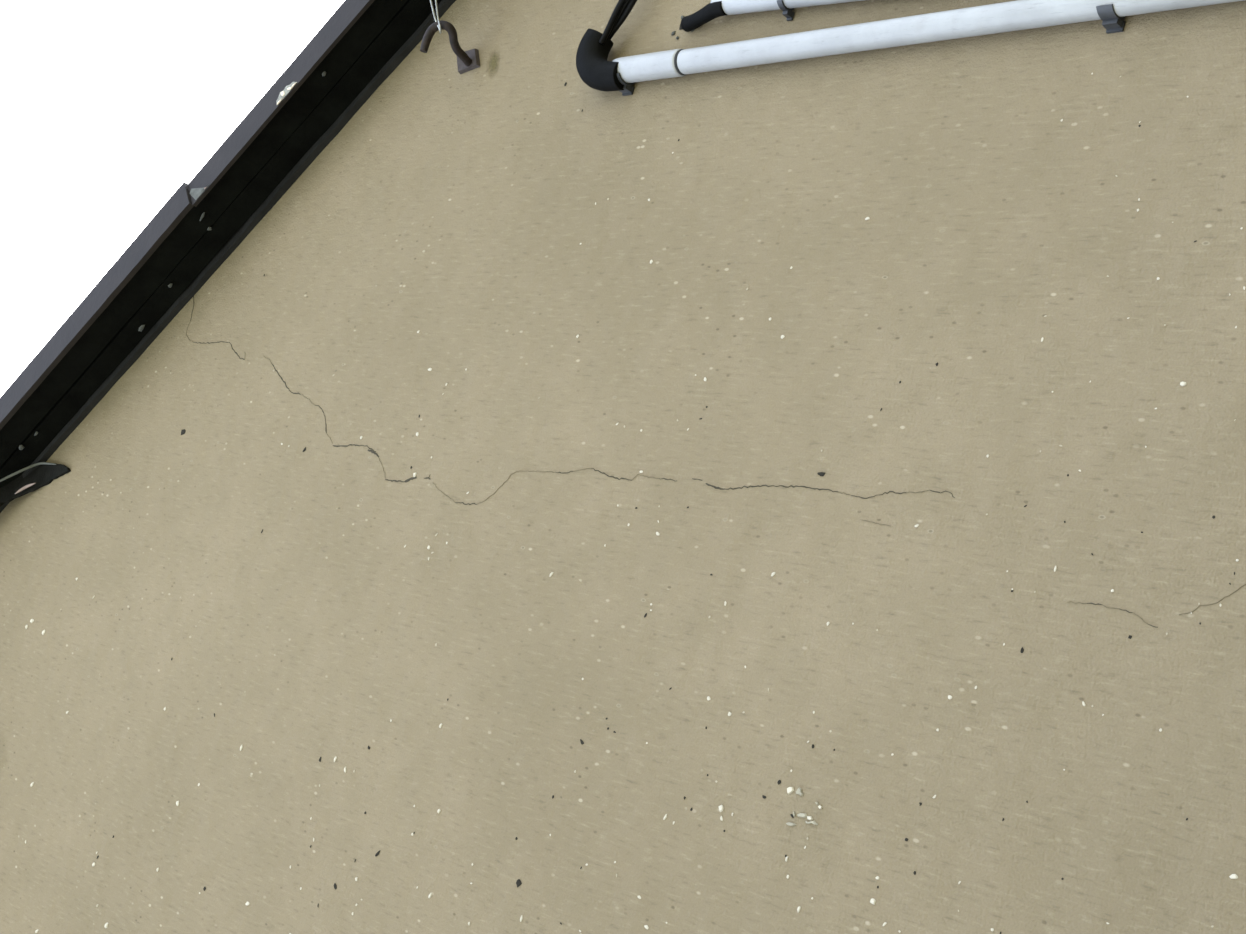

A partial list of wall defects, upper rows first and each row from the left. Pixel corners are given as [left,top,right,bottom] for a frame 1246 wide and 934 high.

crack [186,296,955,526]